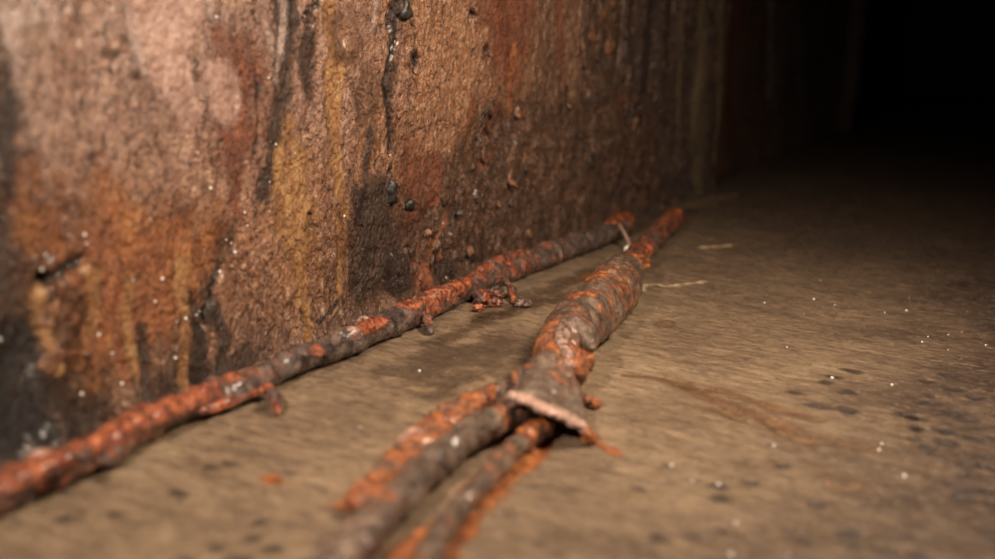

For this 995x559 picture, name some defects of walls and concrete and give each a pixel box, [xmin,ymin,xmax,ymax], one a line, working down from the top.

crack [381,12,417,193]
rust [323,0,348,297]
rust [274,115,321,342]
crack [33,257,81,286]
rust [0,32,283,498]
crack [201,266,219,319]
rust [409,249,530,335]
rust [353,316,389,339]
rust [495,364,533,408]
rust [564,347,602,409]
rust [385,520,434,559]